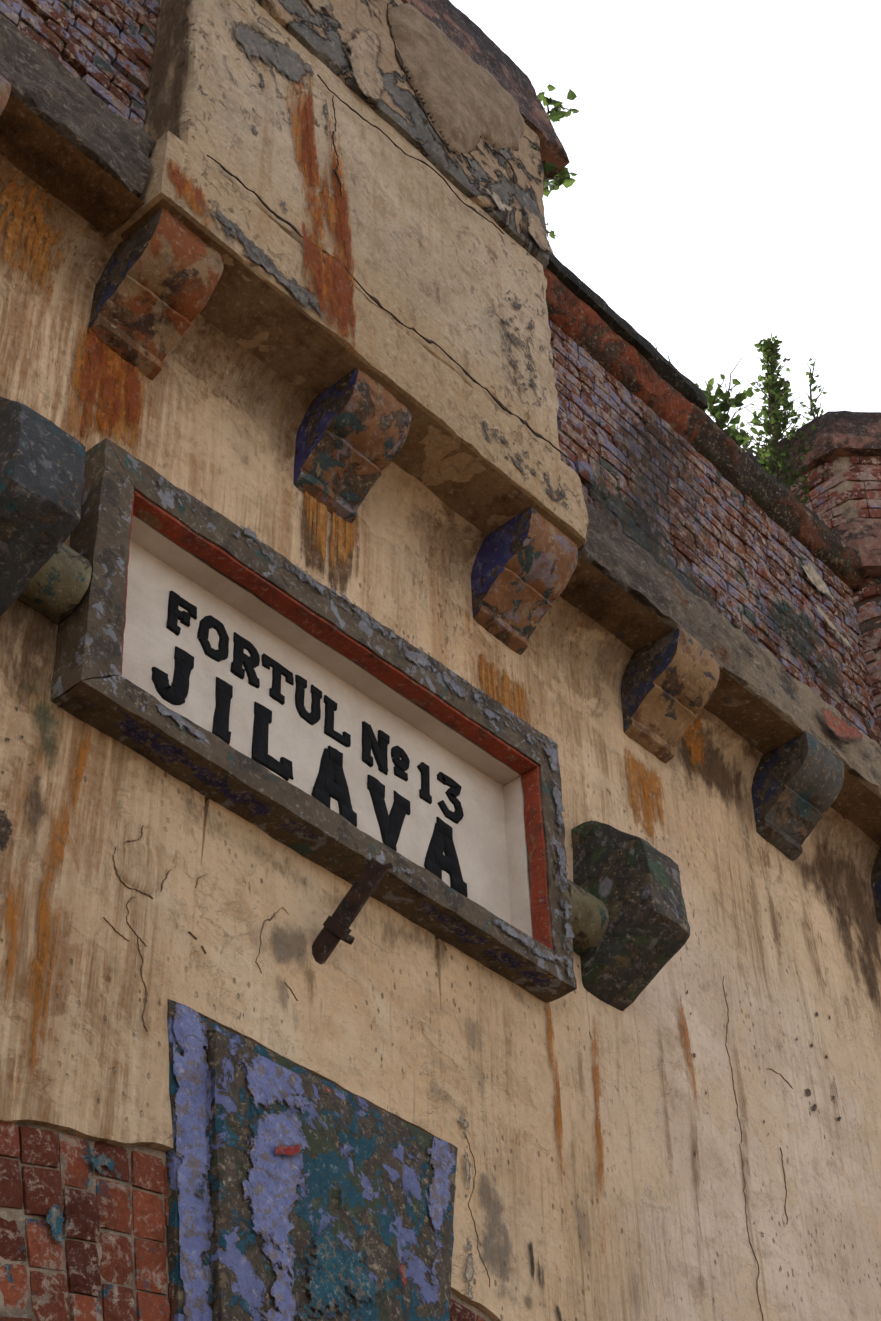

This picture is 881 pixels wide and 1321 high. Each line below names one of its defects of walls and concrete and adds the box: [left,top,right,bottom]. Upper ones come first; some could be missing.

flaking render [344,27,385,102]
rust [69,328,152,448]
rust [287,80,356,349]
crack [206,155,566,458]
rust [300,491,359,593]
rust [5,732,91,1067]
crack [103,897,148,1032]
water stain [800,840,881,1007]
peeling [172,1003,214,1321]
peeling [234,1054,383,1321]
peeling [425,1117,490,1299]
crack [723,976,764,1321]